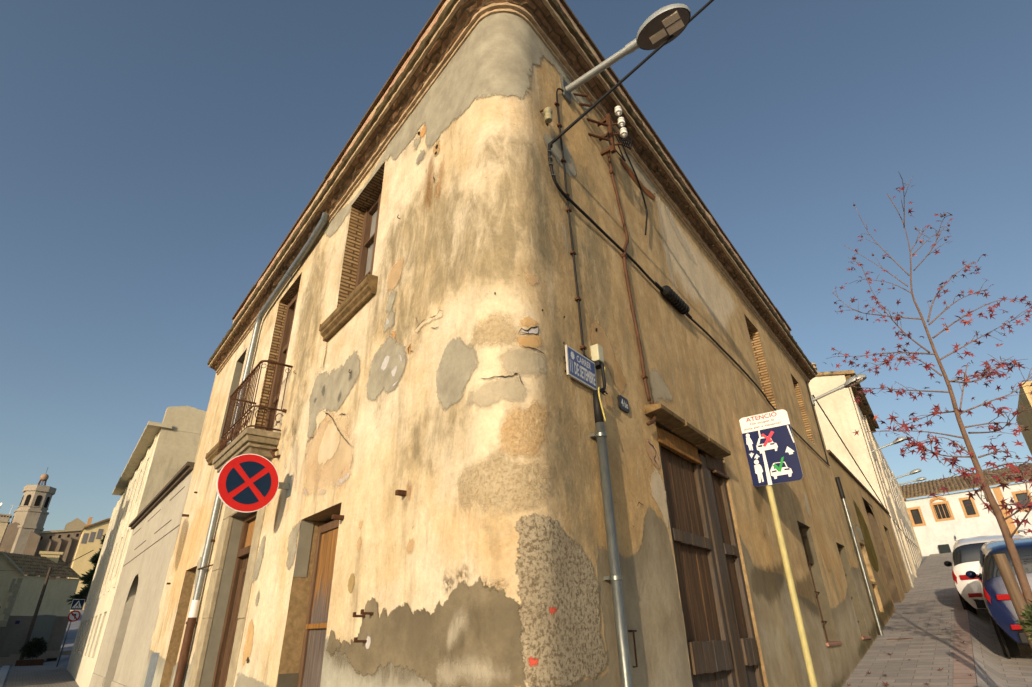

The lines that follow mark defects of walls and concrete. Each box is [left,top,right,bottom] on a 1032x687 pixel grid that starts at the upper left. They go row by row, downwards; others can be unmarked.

peeling [413,124,438,164]
flaking render [326,315,608,687]